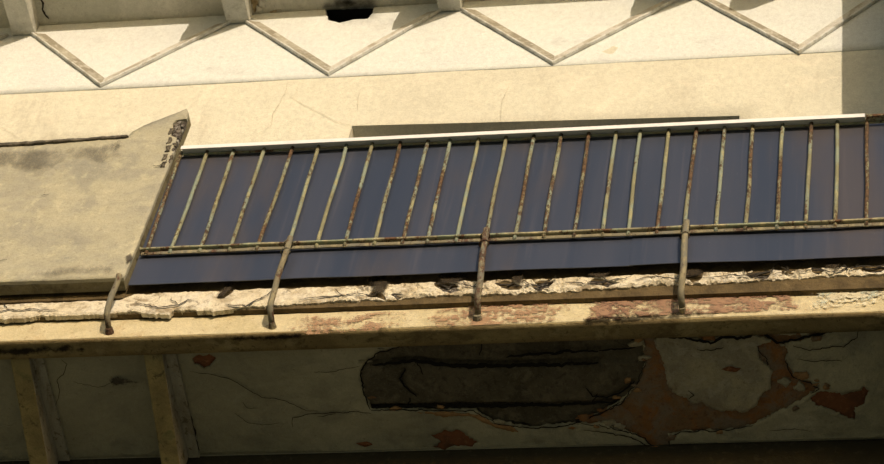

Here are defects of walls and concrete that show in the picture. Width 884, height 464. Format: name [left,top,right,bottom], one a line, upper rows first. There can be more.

peeling [251,0,282,14]
hole [325,0,373,23]
crack [196,372,371,426]
spalling [358,333,868,450]